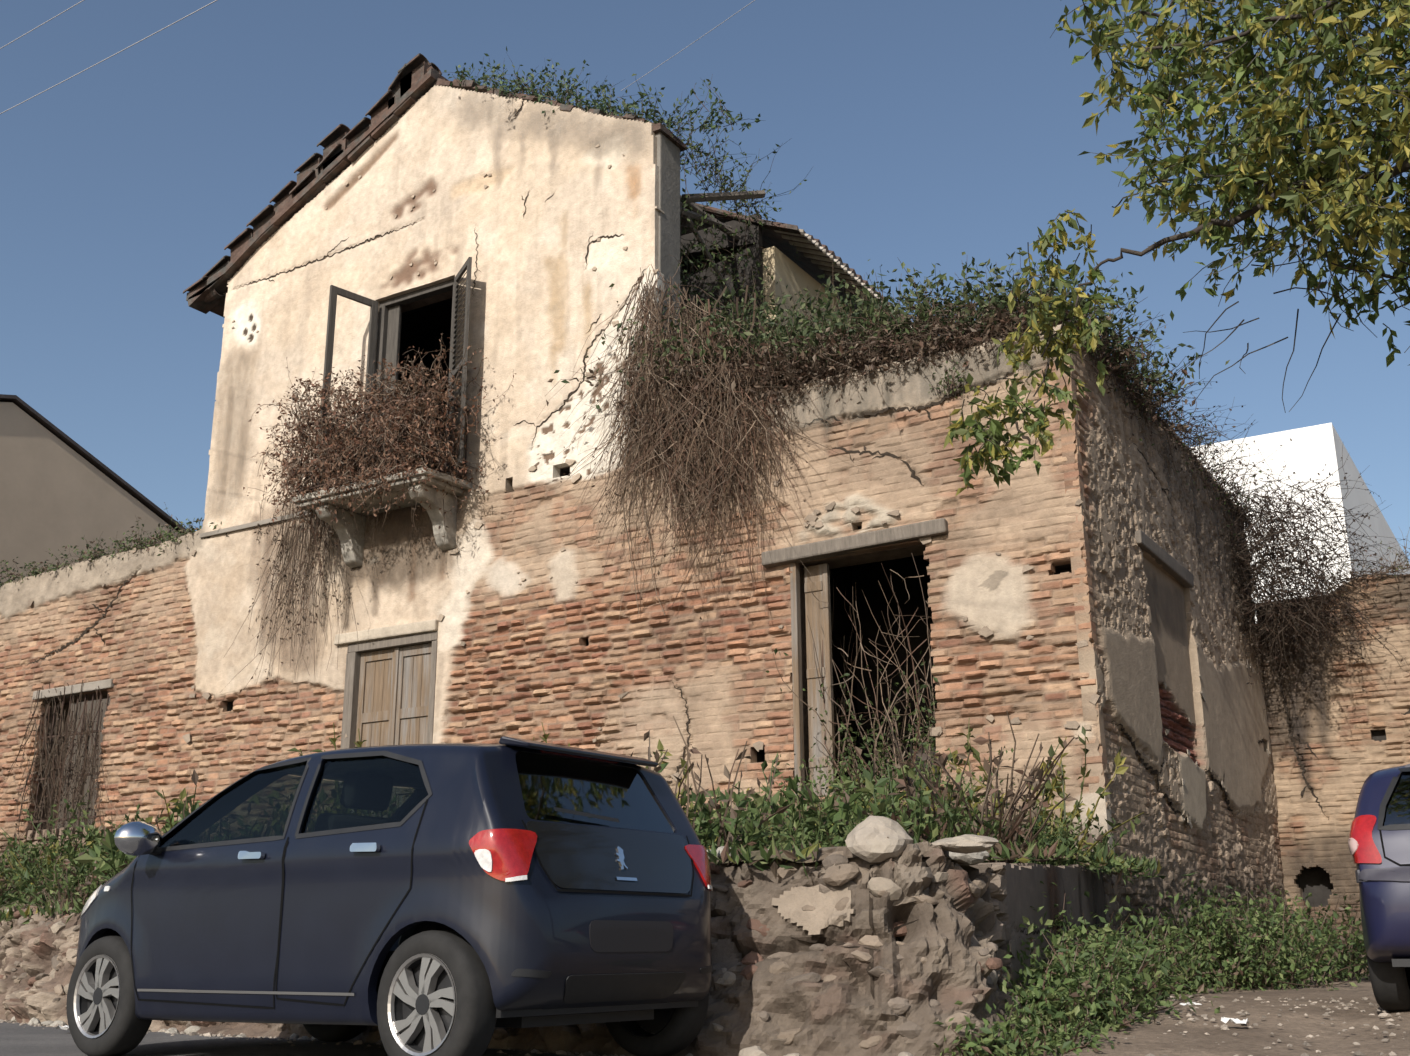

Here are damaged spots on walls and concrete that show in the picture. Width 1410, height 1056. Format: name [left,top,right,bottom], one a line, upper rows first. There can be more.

crack [235,222,415,289]
peeling [585,233,628,274]
crack [803,369,1024,486]
crack [1015,421,1031,445]
spalling [438,269,1289,995]
spalling [0,521,348,875]
crack [667,683,698,782]
crack [1112,721,1188,825]
crack [1206,769,1236,816]